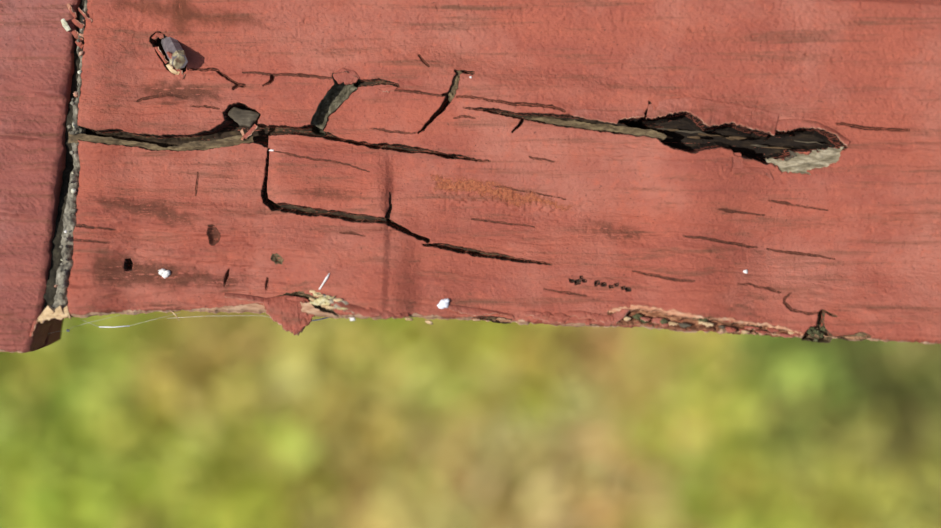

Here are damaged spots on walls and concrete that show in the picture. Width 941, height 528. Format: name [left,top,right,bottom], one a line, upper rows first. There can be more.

crack [836,122,910,131]
crack [68,68,554,265]
crack [496,186,565,200]
crack [544,288,587,297]